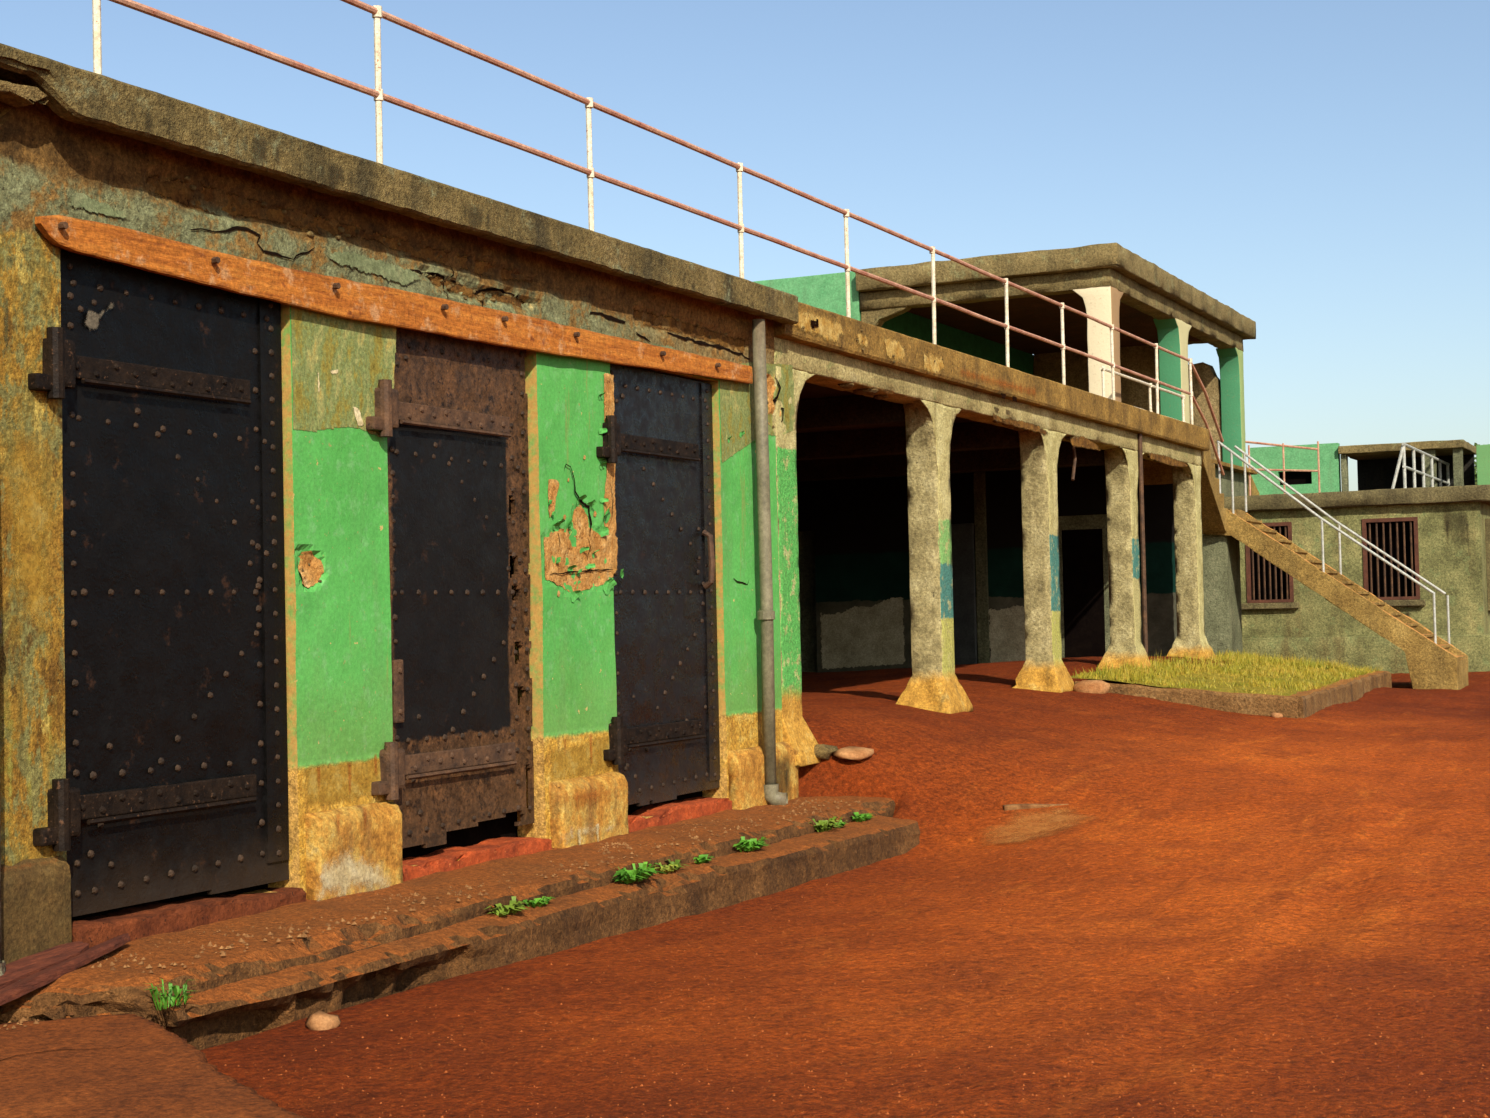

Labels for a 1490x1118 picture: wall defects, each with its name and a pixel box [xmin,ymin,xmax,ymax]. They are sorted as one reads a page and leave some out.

spalling [0,80,49,108]
crack [191,226,315,261]
crack [410,264,524,307]
peeling [291,306,396,437]
peeling [598,373,615,434]
damp [13,441,48,612]
peeling [544,455,624,603]
spalling [298,551,324,588]